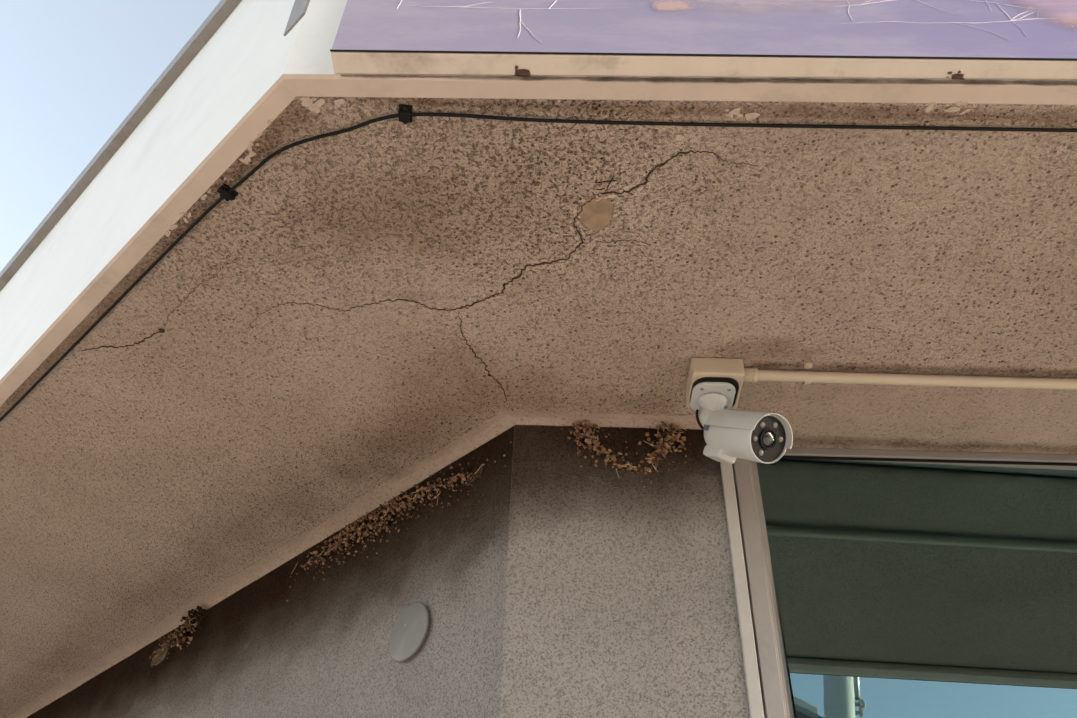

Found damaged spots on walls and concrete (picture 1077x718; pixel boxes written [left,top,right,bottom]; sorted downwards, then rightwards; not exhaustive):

crack [82,262,236,351]
crack [248,150,759,407]